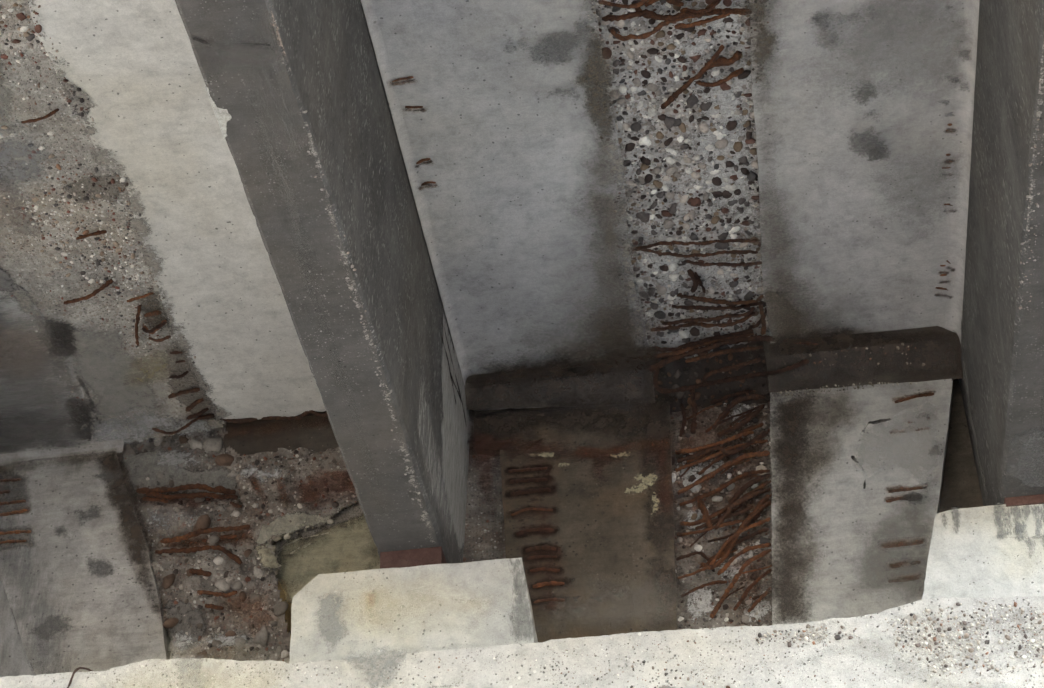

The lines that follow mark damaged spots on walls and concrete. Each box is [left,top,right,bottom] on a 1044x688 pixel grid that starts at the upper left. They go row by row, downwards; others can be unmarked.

rust [392,76,414,85]
water stain [852,85,876,115]
water stain [850,130,886,161]
water stain [0,313,162,613]
spalling [0,0,363,688]
spalling [295,87,435,542]
spalling [505,464,569,610]
spalling [530,0,1044,688]
water stain [769,271,1044,621]